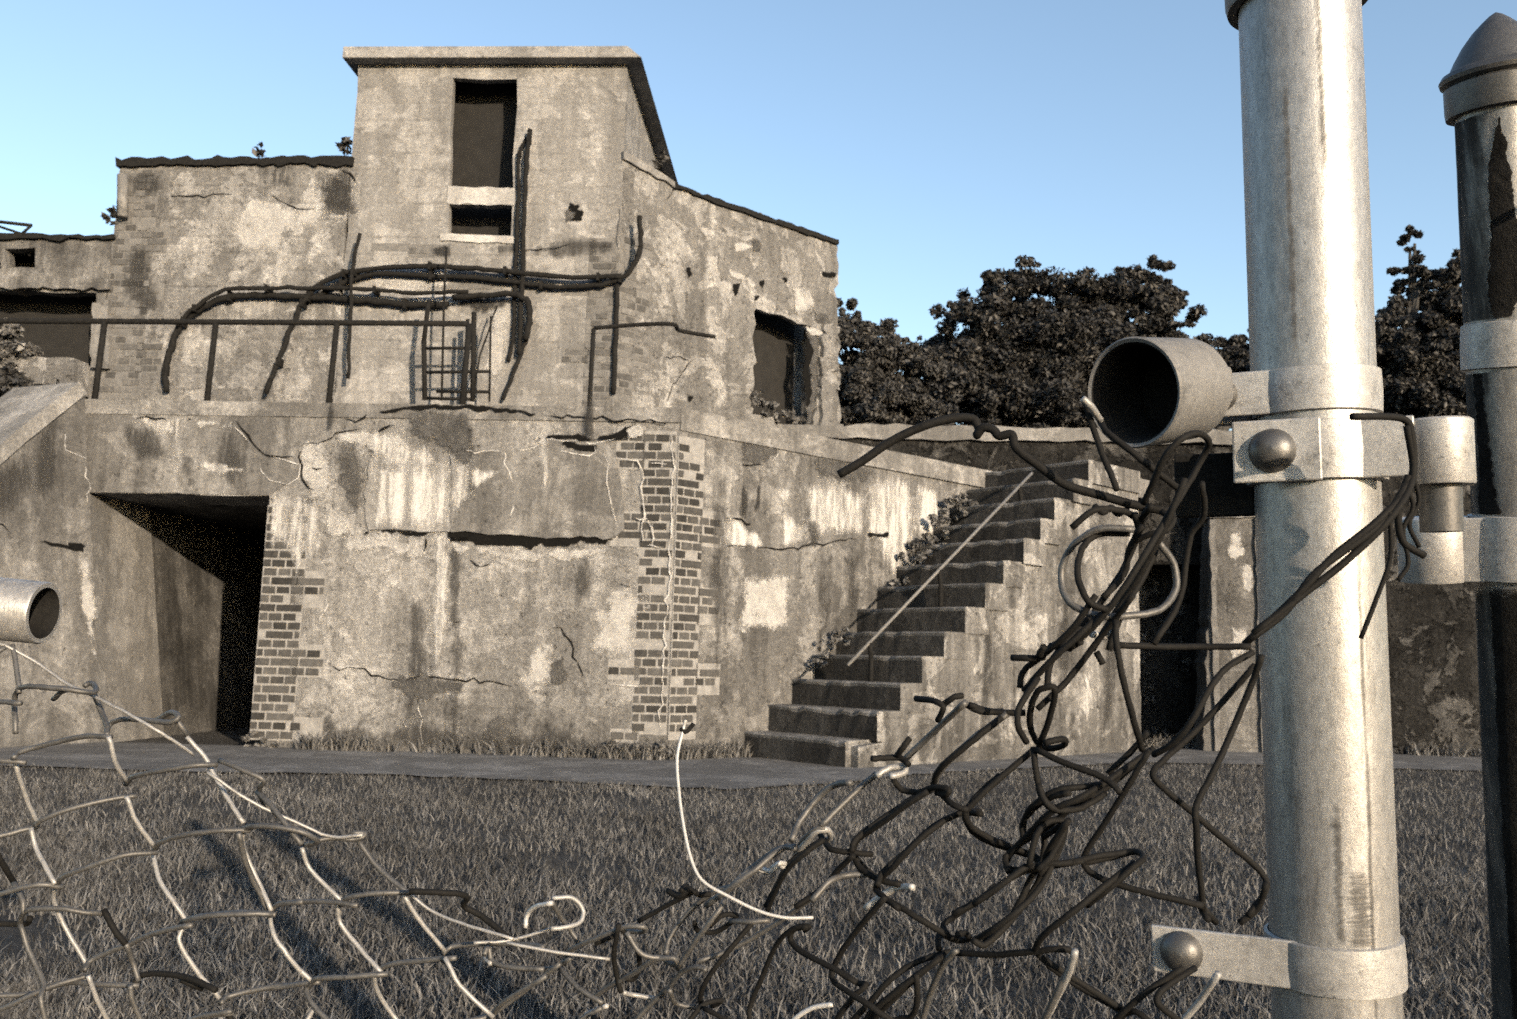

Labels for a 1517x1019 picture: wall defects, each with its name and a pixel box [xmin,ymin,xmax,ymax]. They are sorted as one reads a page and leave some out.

peeling [735,239,762,252]
spalling [793,285,830,425]
crack [235,415,393,490]
peeling [590,584,653,653]
peeling [739,575,789,633]